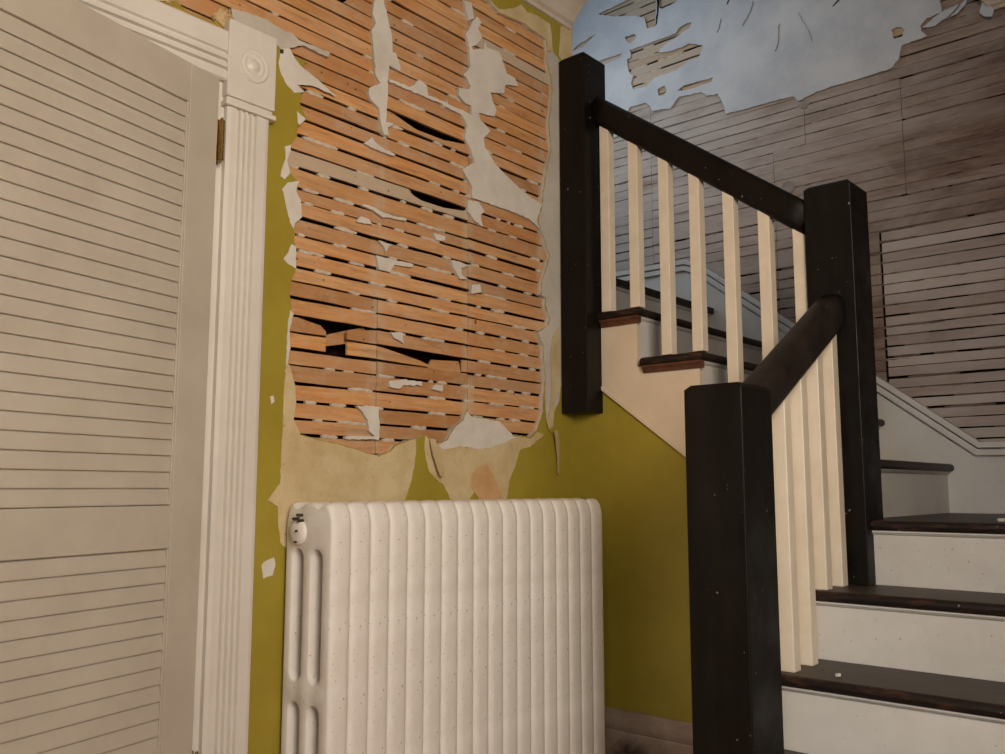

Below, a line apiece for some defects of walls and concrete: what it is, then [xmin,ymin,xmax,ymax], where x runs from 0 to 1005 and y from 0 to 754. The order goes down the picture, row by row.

flaking render [601,0,677,28]
flaking render [600,24,702,96]
flaking render [158,0,592,548]
flaking render [614,137,630,272]
flaking render [629,0,1005,442]
peeling [261,558,275,579]